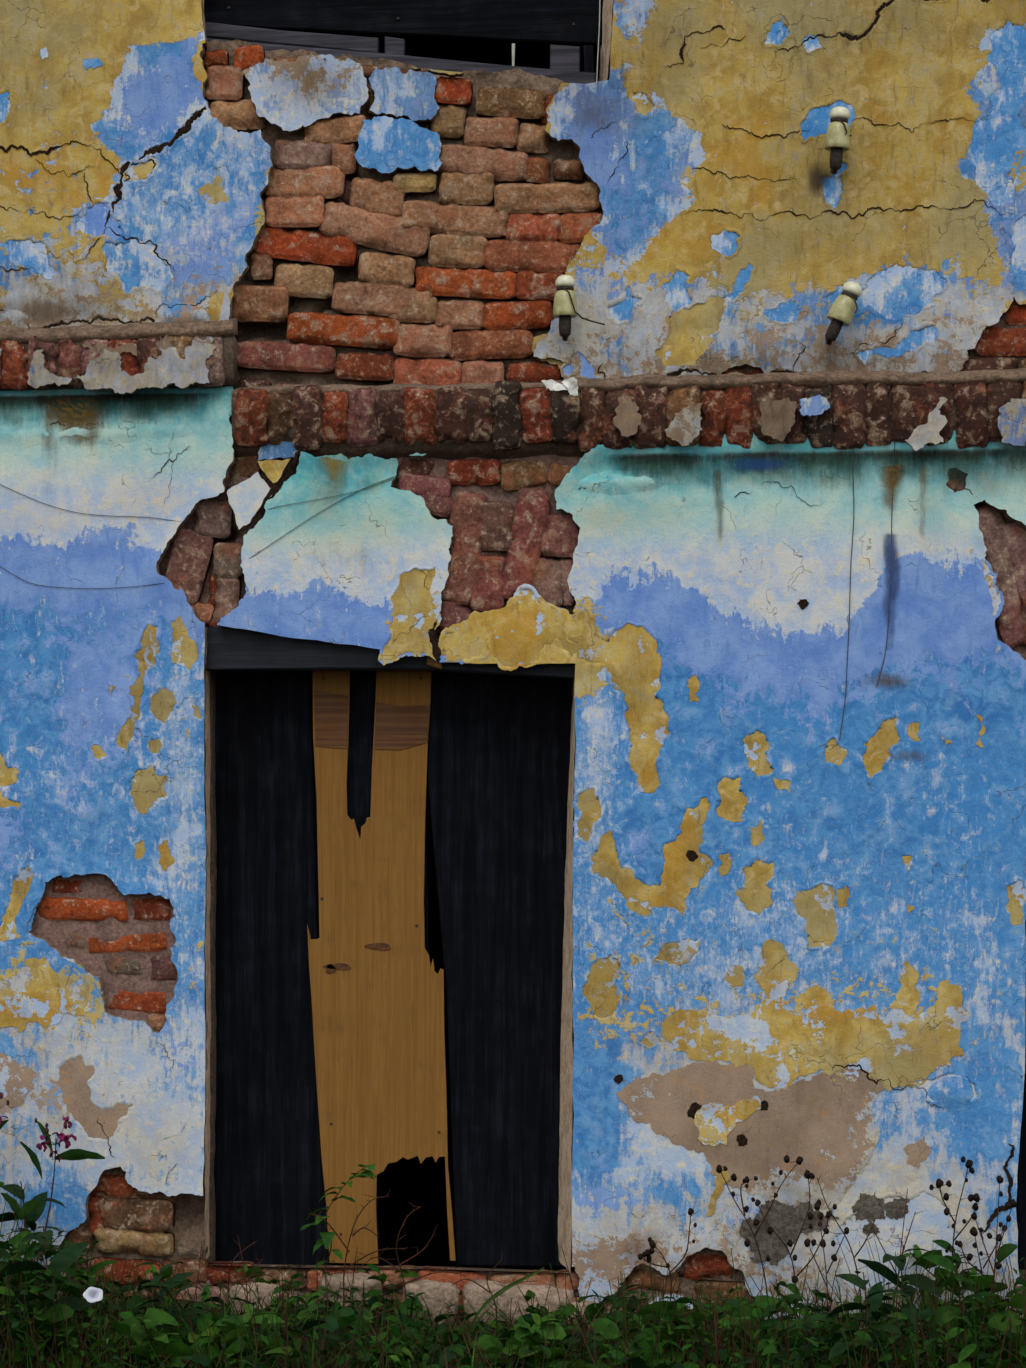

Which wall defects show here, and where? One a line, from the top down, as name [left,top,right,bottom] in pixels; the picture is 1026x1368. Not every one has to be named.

crack [663,0,1007,67]
crack [0,106,218,328]
flaking render [202,39,603,388]
crack [722,124,804,139]
crack [687,167,1022,221]
crack [856,116,993,133]
damp [0,394,195,417]
flaking render [88,442,300,817]
peeling [573,727,853,954]
flaking render [0,863,178,1033]
peeling [617,936,983,1294]
flaking render [59,1167,580,1315]